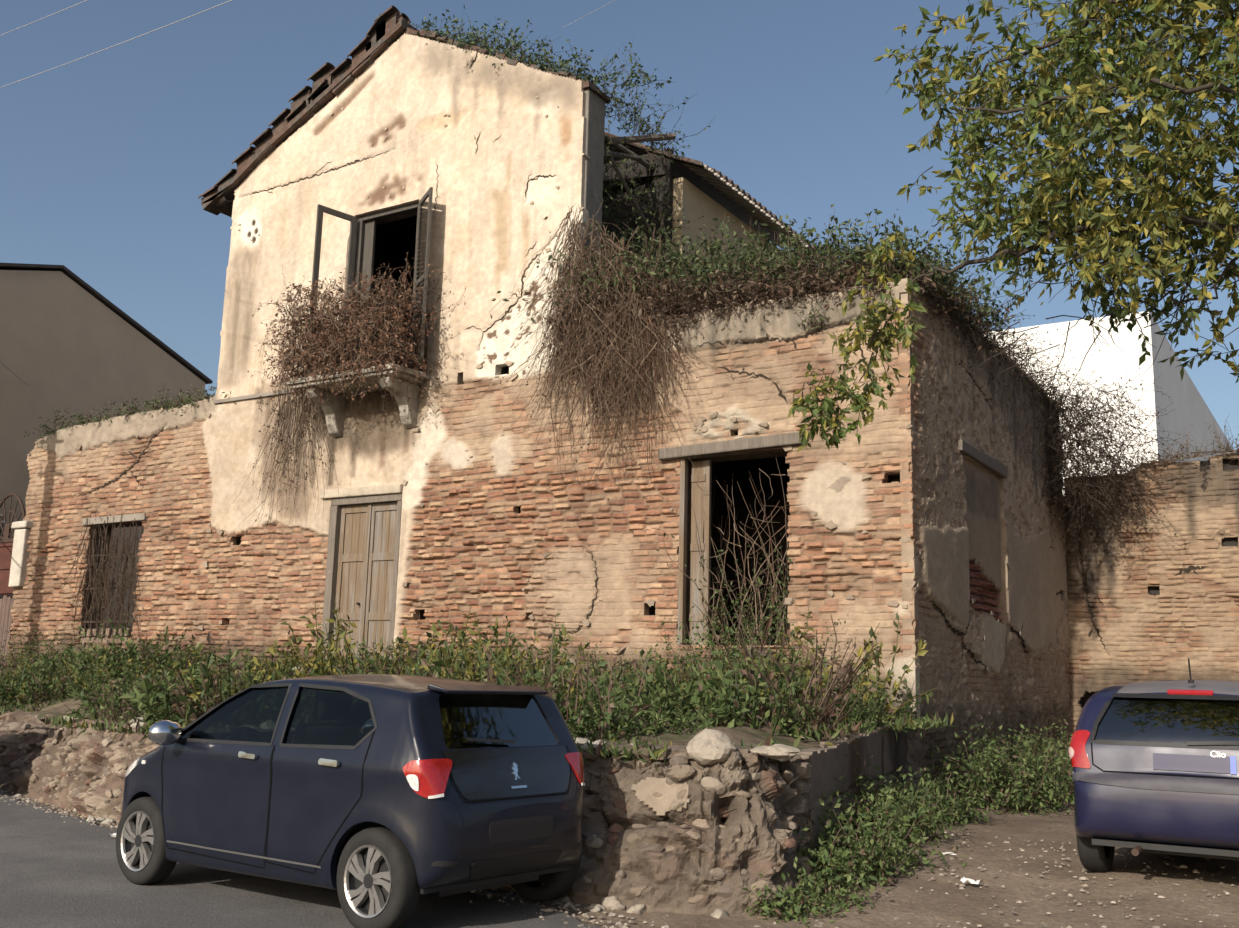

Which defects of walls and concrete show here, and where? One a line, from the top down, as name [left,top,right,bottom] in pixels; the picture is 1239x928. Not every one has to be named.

crack [241,151,390,197]
peeling [525,174,559,207]
crack [696,315,878,403]
flaking render [4,390,331,676]
flaking render [399,207,1072,801]
crack [538,549,602,638]
crack [926,599,987,671]
crack [1006,623,1031,656]